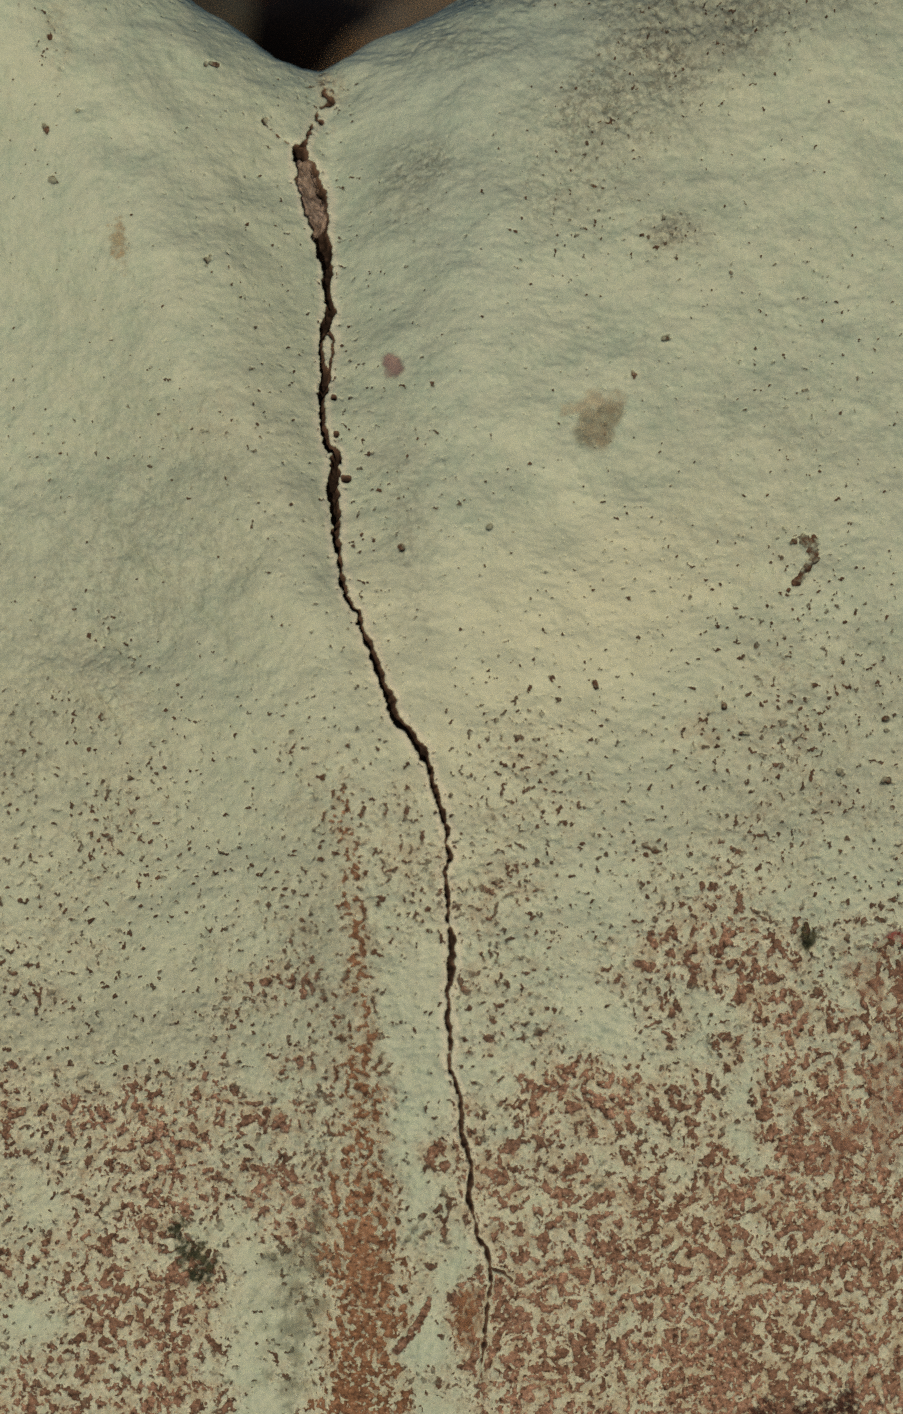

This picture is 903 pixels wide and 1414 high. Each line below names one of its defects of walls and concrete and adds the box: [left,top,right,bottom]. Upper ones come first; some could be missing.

spalling [550,33,651,257]
spalling [623,213,698,260]
spalling [334,381,434,470]
crack [261,88,513,1380]
peeling [0,485,903,1414]